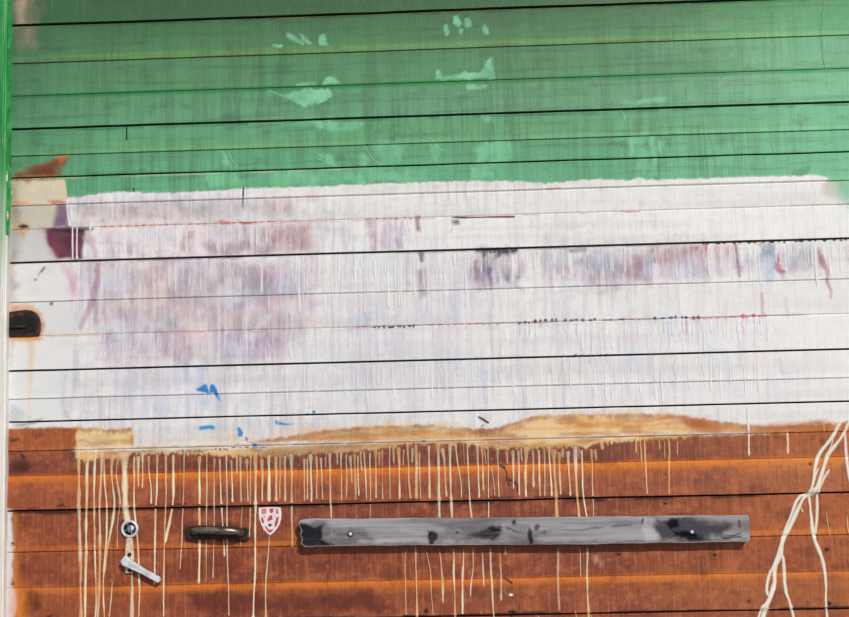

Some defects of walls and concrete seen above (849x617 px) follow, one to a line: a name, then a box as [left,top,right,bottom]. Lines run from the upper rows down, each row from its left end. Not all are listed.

rust [15,157,65,177]